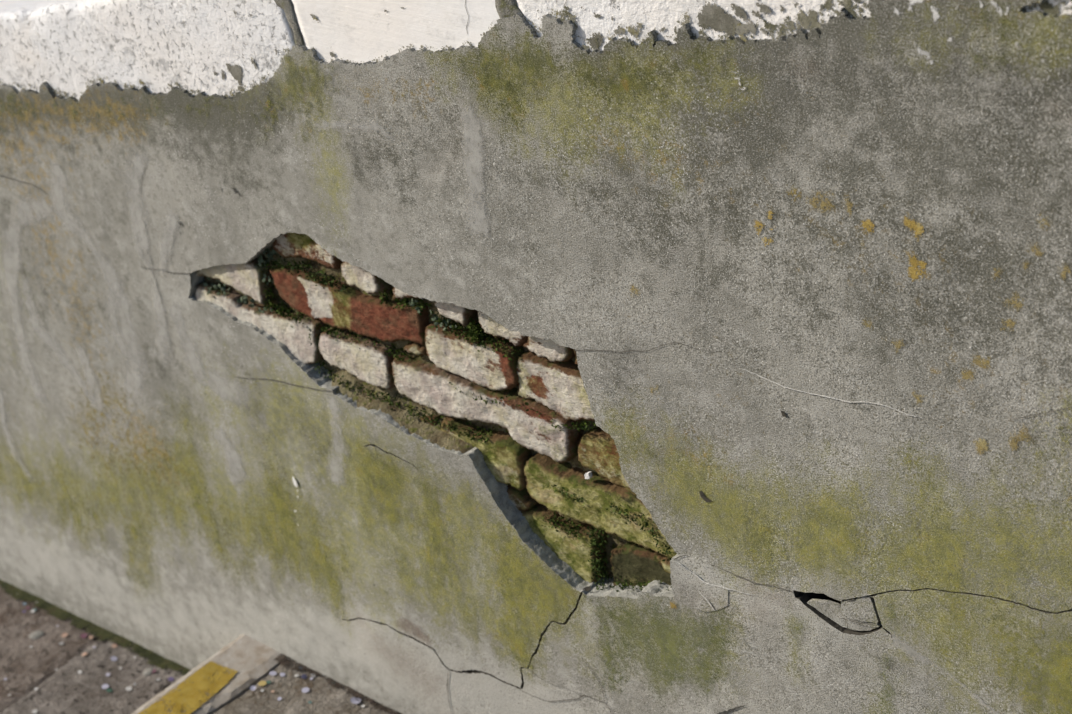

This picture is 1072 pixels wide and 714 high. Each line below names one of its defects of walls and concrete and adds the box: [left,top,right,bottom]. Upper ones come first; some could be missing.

peeling [522,0,869,50]
peeling [893,0,940,22]
peeling [1022,0,1072,15]
leakage [327,397,348,485]
flaking render [188,232,729,612]
crack [674,555,794,610]
crack [521,586,611,713]